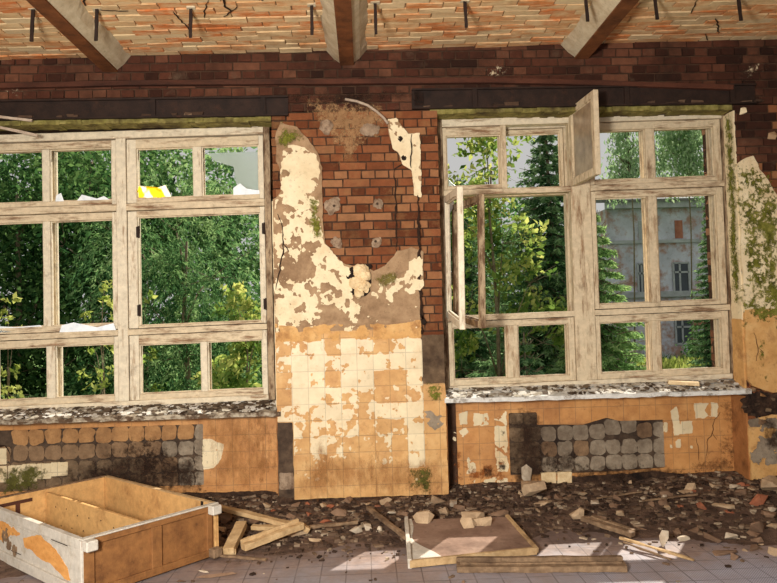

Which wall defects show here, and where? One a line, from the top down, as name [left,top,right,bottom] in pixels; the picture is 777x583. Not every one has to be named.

crack [173,0,238,30]
flaking render [734,105,777,179]
flaking render [272,110,444,481]
peeling [0,424,406,504]
peeling [453,402,718,483]
flaking render [740,388,777,466]